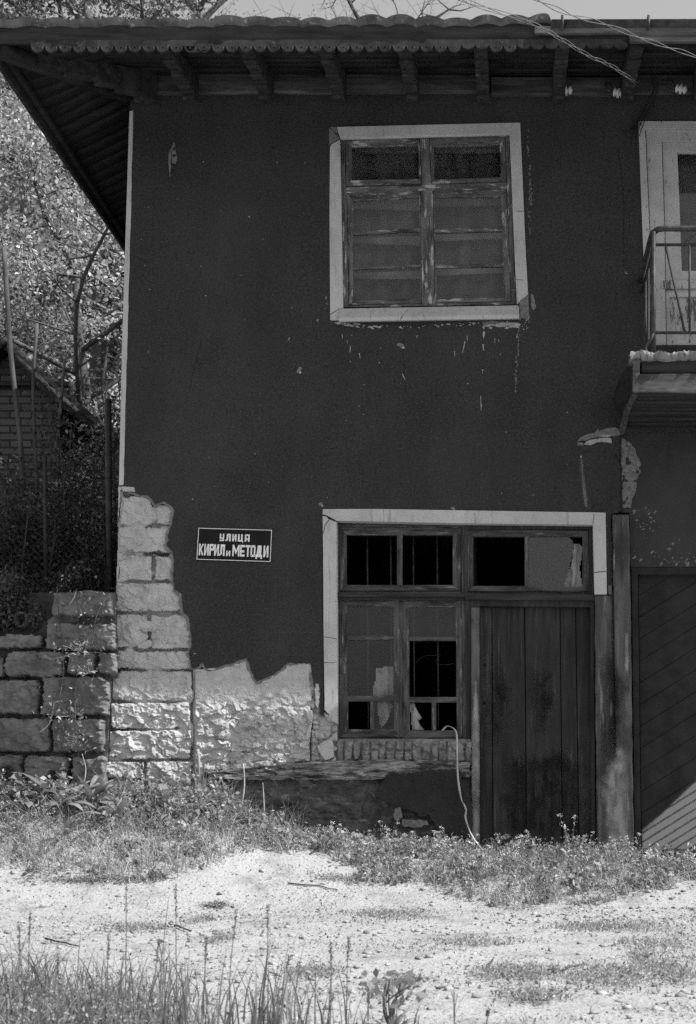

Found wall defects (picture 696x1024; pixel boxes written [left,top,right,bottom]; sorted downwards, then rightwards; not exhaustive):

spalling [106,486,337,797]
spalling [577,427,696,567]